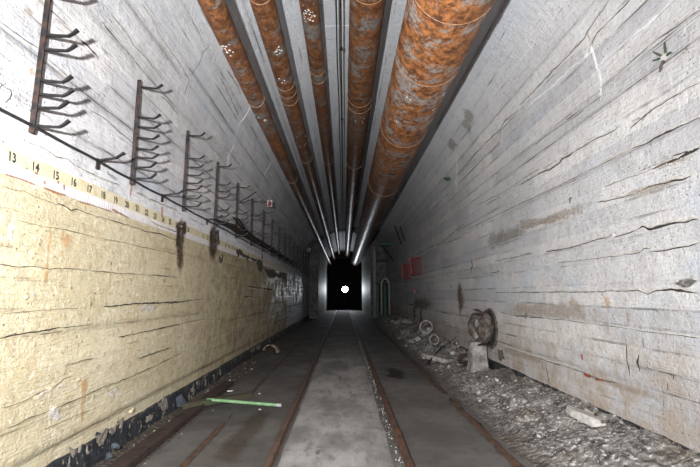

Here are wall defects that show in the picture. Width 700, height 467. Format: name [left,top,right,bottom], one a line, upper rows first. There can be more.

crack [418,80,700,254]
water stain [176,222,186,267]
water stain [210,227,219,257]
crack [483,216,699,274]
crack [104,299,204,309]
crack [495,286,700,296]
spalling [676,276,696,290]
crack [0,308,93,342]
peeling [95,407,135,446]